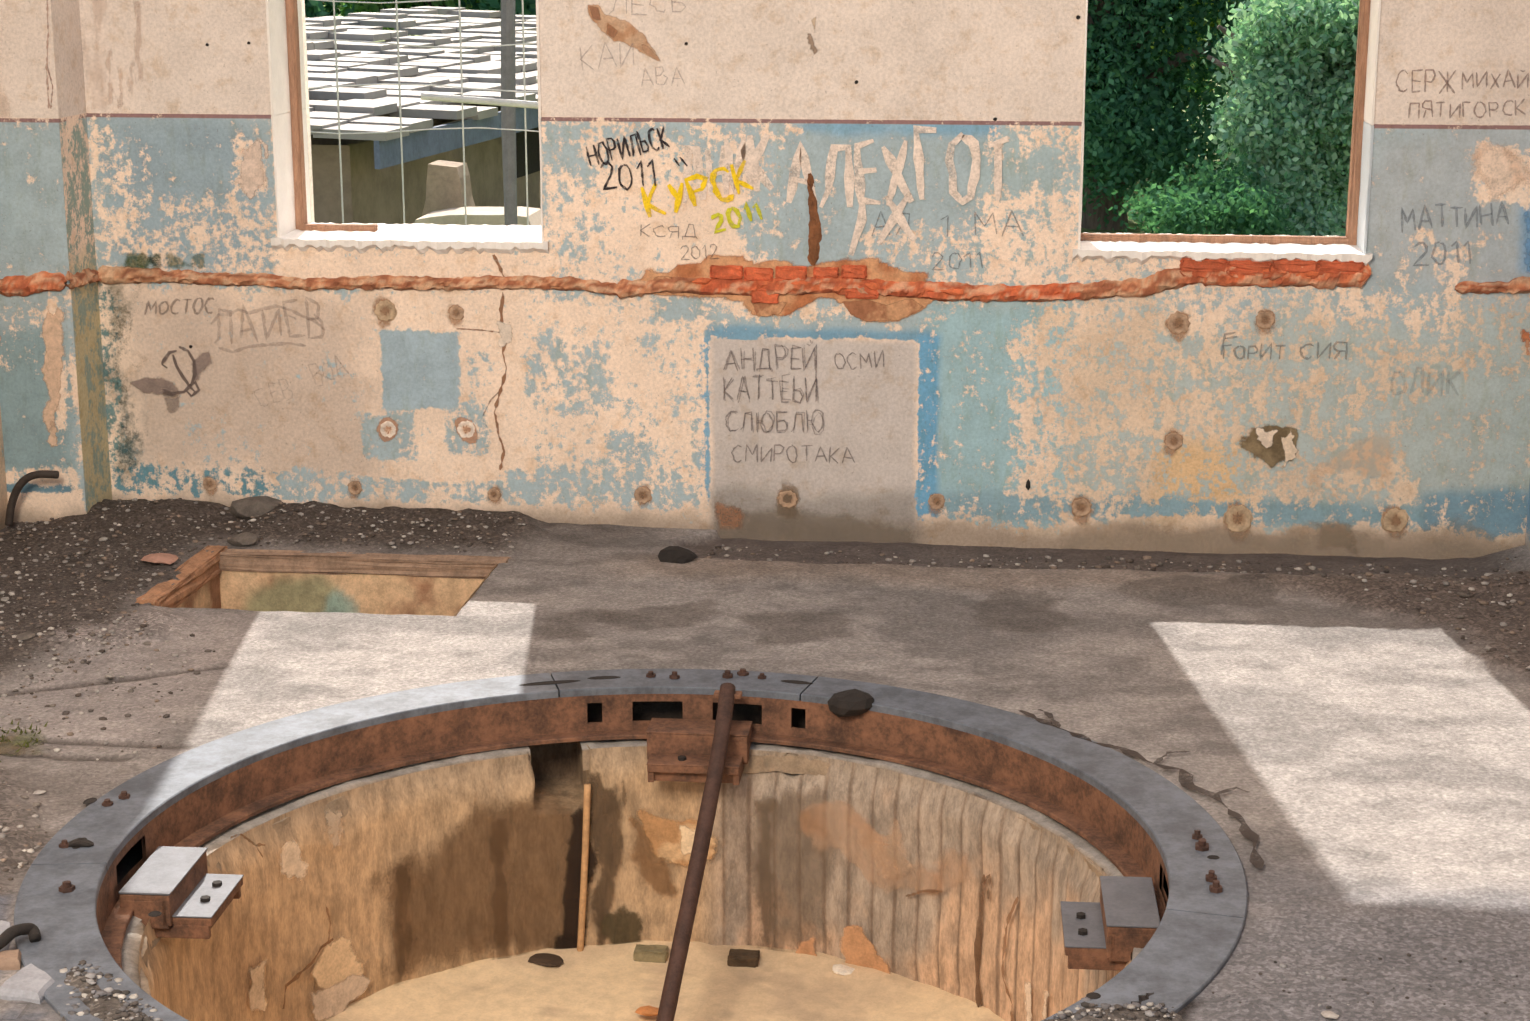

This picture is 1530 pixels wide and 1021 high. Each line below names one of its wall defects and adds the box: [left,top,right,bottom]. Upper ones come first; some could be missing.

peeling [588,5,660,61]
peeling [235,139,269,199]
spalling [641,255,964,322]
spalling [1179,258,1371,283]
peeling [41,308,64,447]
crack [456,254,513,470]
spalling [1240,425,1298,468]
crack [1019,709,1264,868]